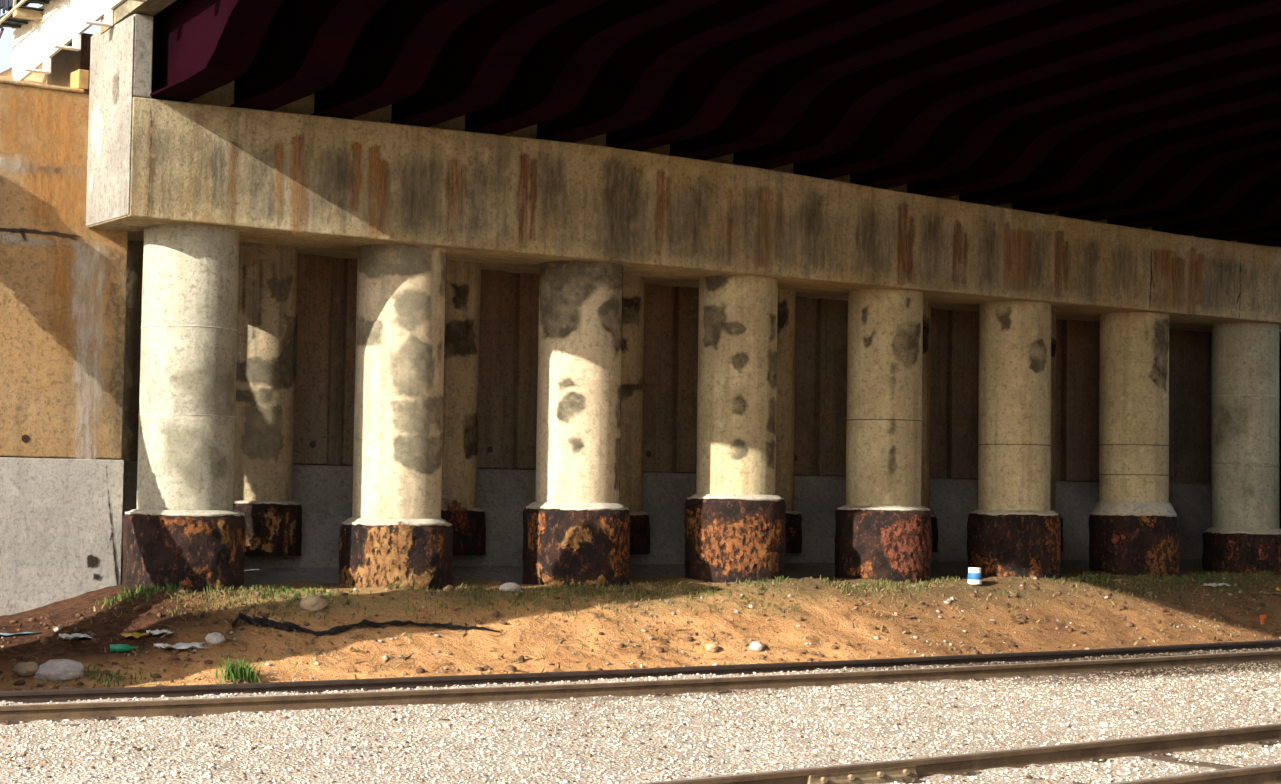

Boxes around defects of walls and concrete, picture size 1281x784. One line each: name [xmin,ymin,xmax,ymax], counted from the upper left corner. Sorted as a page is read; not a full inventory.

rust [352,143,387,225]
rust [518,154,537,241]
rust [898,204,914,283]
damp [1222,348,1281,529]